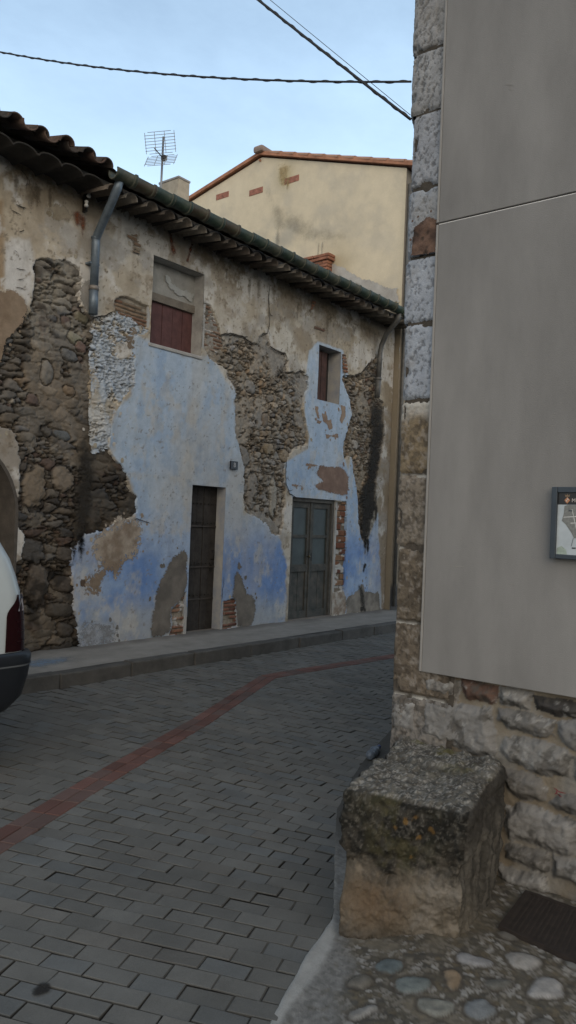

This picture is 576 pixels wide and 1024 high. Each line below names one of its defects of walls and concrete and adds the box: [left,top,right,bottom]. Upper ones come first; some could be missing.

peeling [81,296,149,454]
flaking render [204,296,225,355]
peeling [76,512,148,596]
flaking render [222,595,236,629]
flaking render [292,462,380,616]
water stain [359,402,384,551]